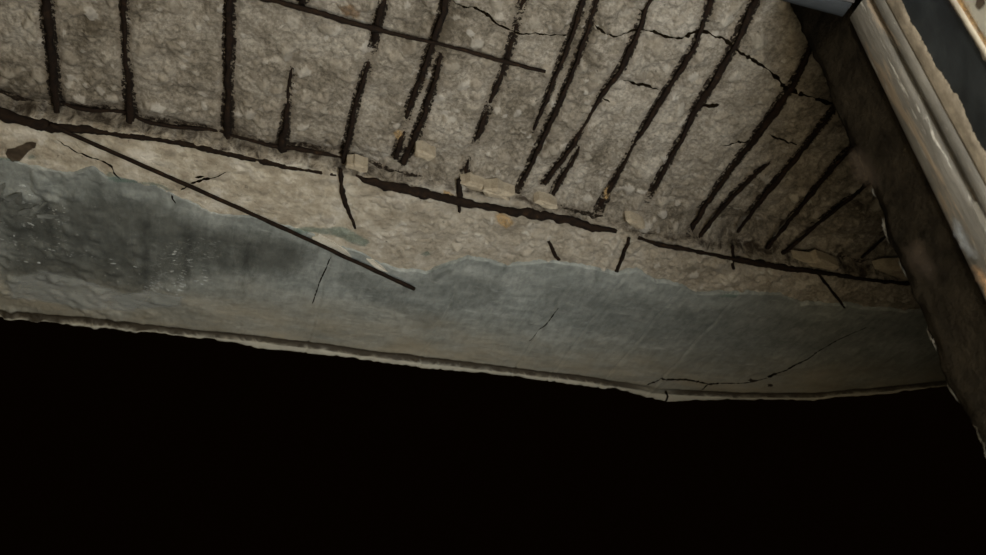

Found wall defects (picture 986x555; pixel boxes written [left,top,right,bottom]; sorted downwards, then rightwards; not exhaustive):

crack [453,0,566,36]
crack [594,8,833,105]
spalling [0,0,920,311]
crack [690,102,719,110]
crack [724,135,797,146]
leakage [0,185,299,309]
crack [647,327,867,402]